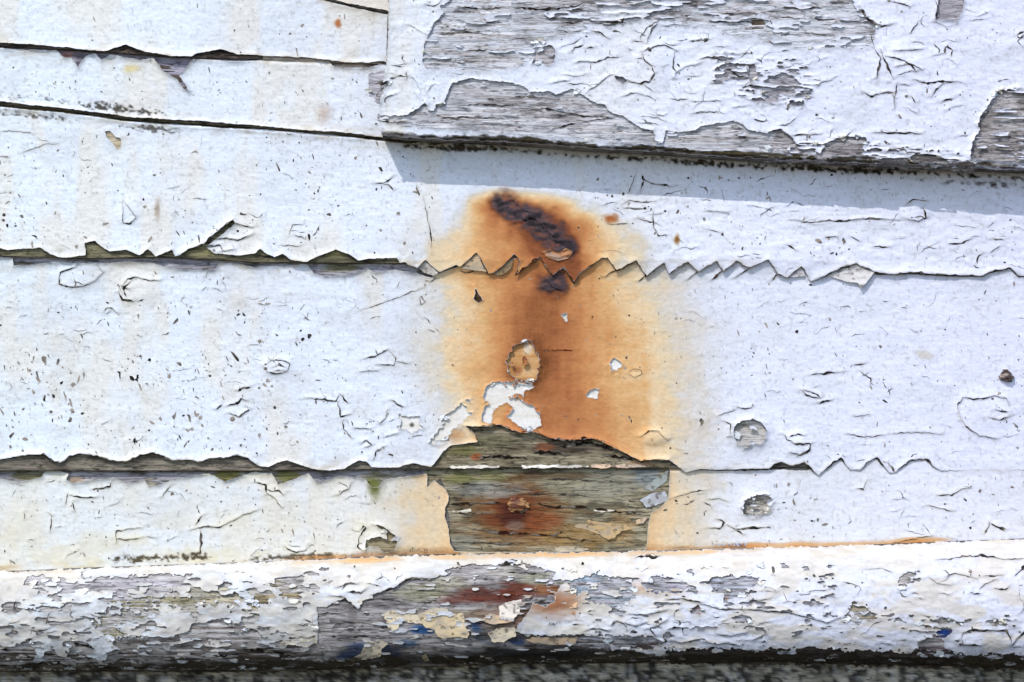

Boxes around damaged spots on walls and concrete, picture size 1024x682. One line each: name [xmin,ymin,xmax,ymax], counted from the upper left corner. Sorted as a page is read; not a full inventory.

peeling [0,0,1024,173]
crack [376,0,968,152]
peeling [0,220,426,277]
corrosion [425,189,947,554]
corrosion [287,474,466,563]
peeling [0,339,1024,672]